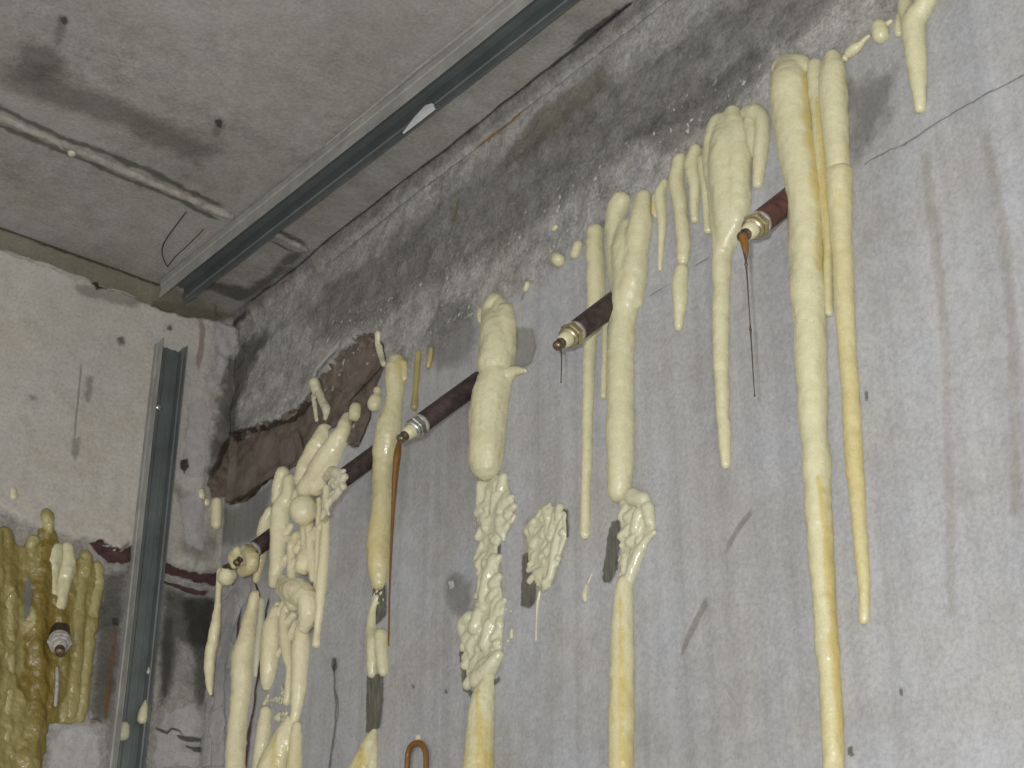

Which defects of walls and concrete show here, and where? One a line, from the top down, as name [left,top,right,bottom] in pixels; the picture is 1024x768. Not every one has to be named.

water stain [252,2,634,301]
spalling [207,333,386,504]